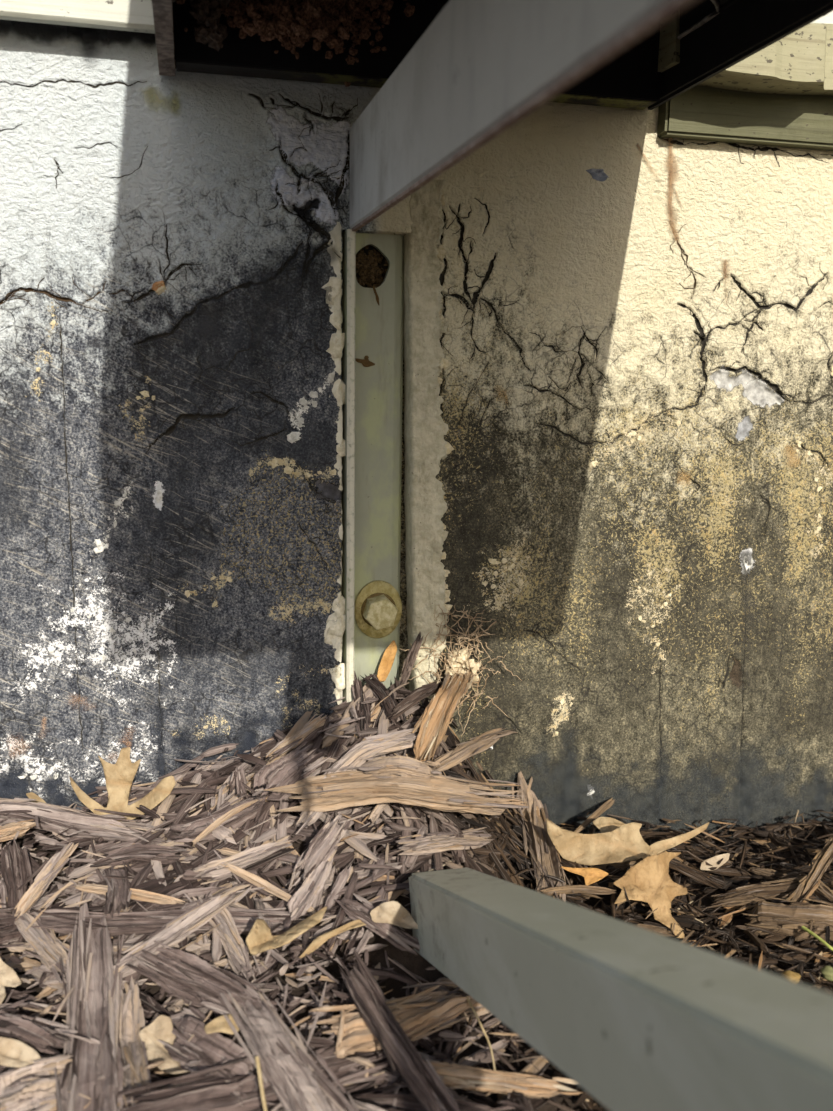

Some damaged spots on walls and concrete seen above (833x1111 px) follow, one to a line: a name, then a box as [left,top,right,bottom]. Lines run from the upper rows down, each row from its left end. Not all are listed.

crack [0,79,147,88]
crack [439,198,833,472]
crack [0,93,358,751]
spalling [709,366,784,441]
crack [759,493,771,537]
leakage [0,762,31,802]
leakage [45,774,101,808]
leakage [130,708,290,791]
leakage [502,733,833,838]